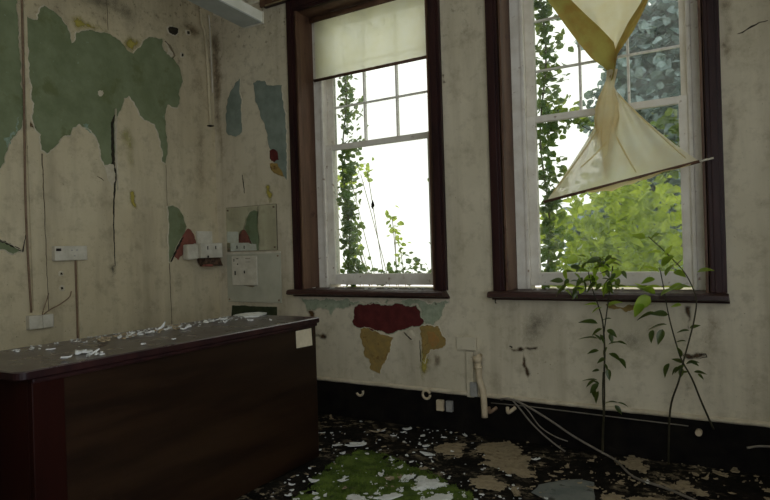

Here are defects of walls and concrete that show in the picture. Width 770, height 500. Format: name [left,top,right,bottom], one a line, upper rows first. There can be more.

peeling [0,0,191,169]
peeling [225,78,288,181]
peeling [0,242,22,255]
crack [0,235,26,252]
crack [41,154,49,310]
crack [97,109,119,259]
peeling [166,205,196,263]
peeling [301,297,450,379]